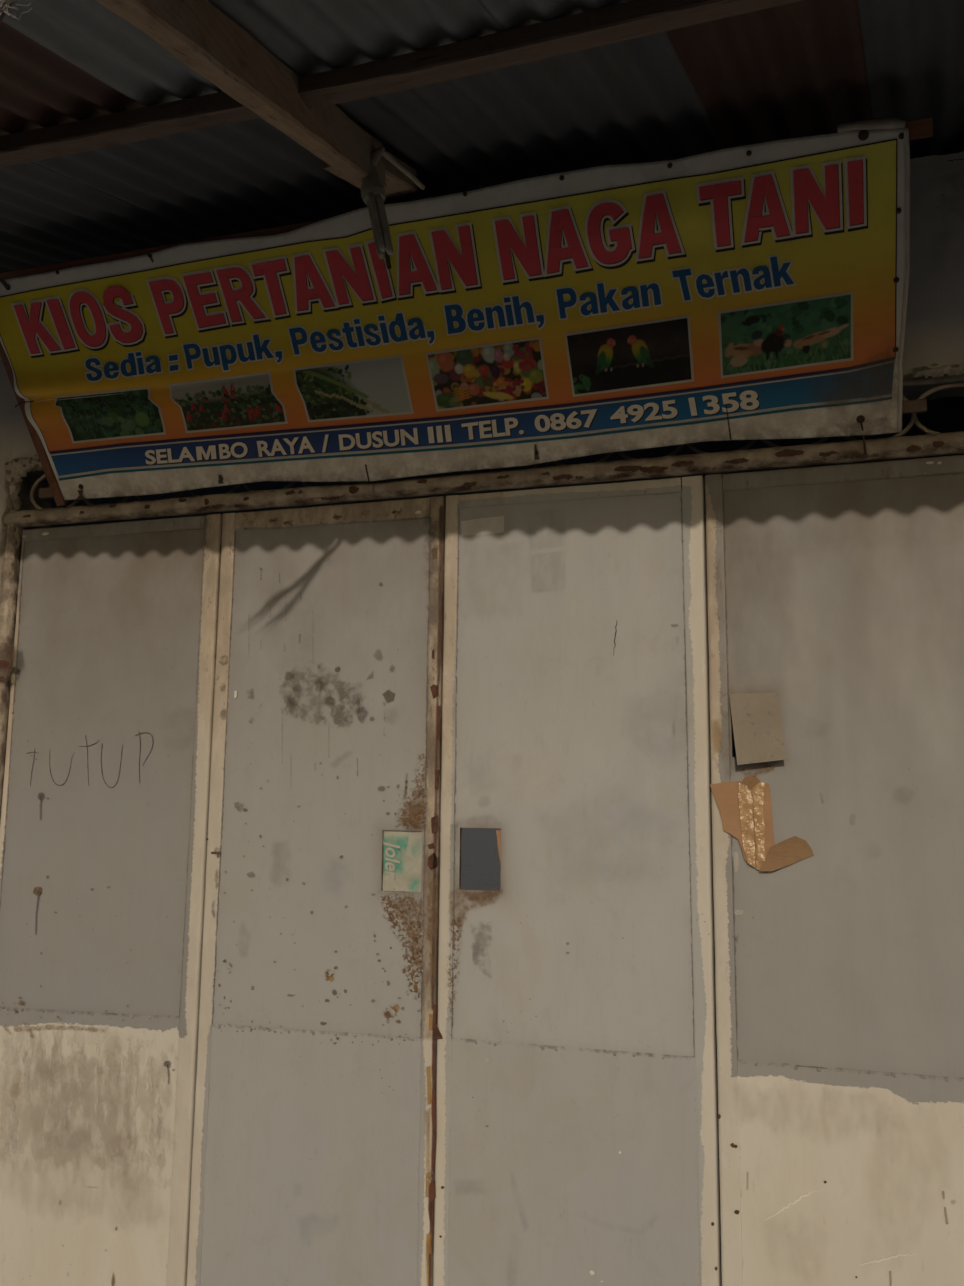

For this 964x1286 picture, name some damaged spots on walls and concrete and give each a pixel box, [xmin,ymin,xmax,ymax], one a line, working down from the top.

corrosion [610,461,698,478]
corrosion [374,506,502,1286]